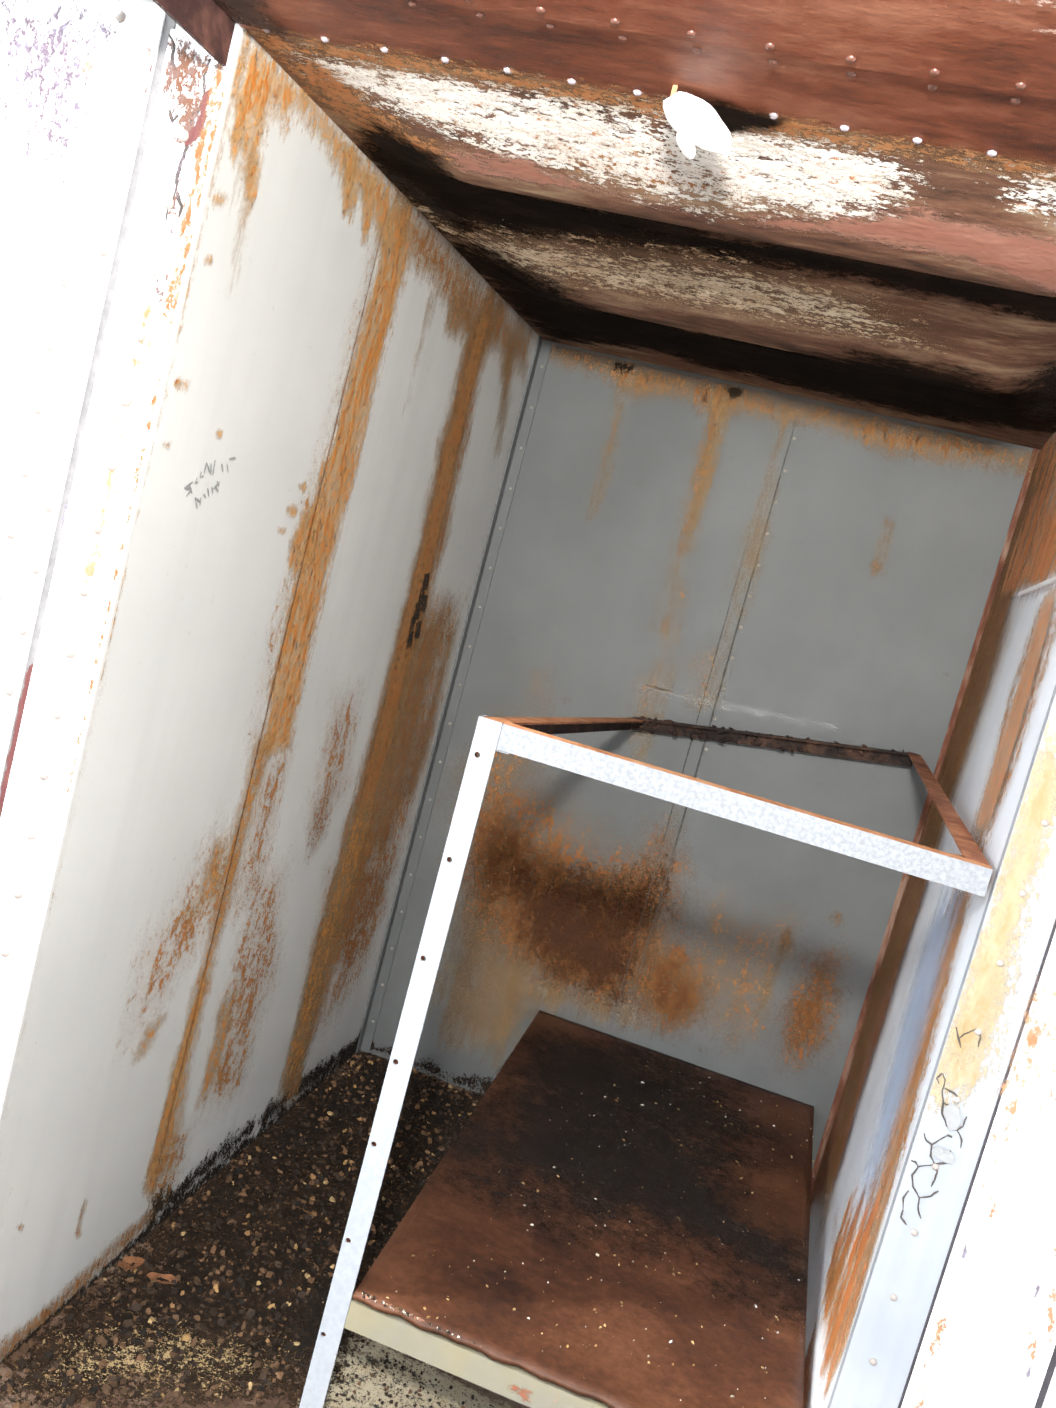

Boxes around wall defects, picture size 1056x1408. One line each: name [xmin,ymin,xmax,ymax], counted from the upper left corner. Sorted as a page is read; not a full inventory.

corrosion [703,98,1056,185]
corrosion [750,206,1056,292]
corrosion [0,0,695,1408]
corrosion [712,875,926,1214]
corrosion [803,888,972,1408]
corrosion [992,975,1056,1166]
corrosion [1027,1243,1056,1360]